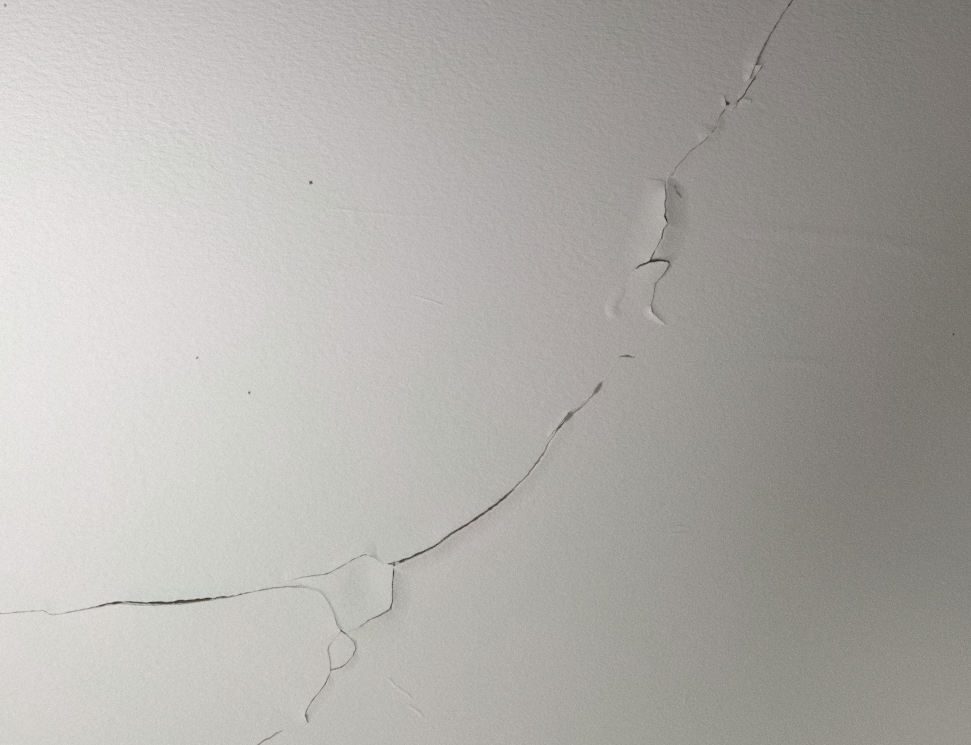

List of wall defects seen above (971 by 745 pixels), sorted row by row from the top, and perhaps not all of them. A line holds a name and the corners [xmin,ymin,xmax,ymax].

crack [665,0,793,182]
peeling [604,171,690,325]
crack [372,355,631,577]
crack [252,731,281,745]